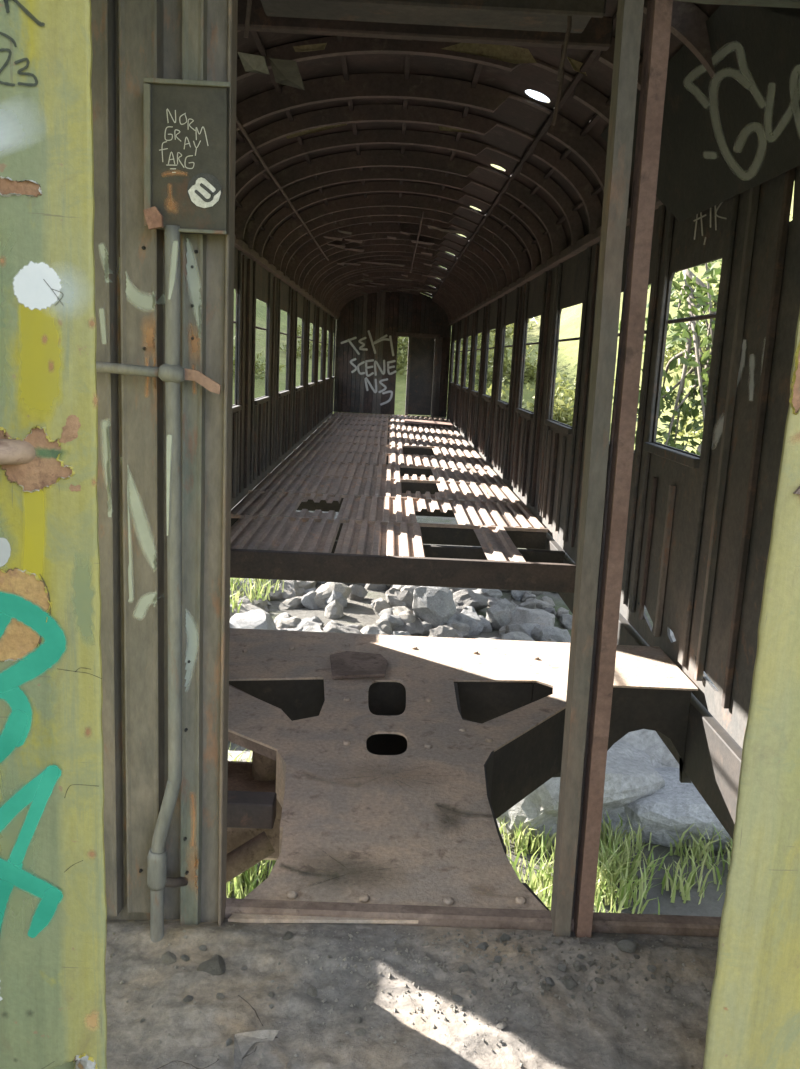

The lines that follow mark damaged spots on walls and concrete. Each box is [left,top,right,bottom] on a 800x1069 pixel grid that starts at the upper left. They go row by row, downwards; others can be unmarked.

peeling [789,342,800,415]
peeling [0,415,81,493]
peeling [0,805,35,875]
peeling [7,885,31,924]
peeling [73,1053,98,1069]